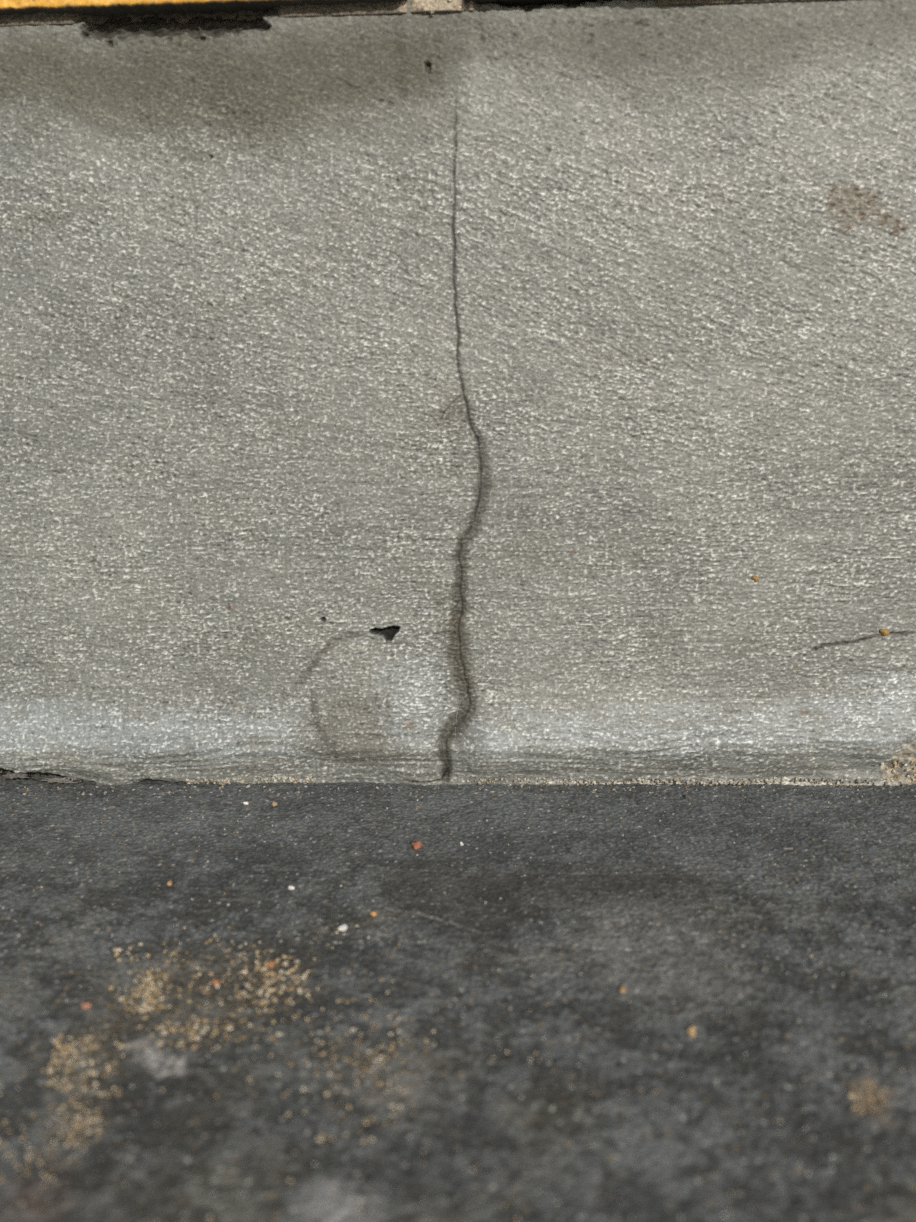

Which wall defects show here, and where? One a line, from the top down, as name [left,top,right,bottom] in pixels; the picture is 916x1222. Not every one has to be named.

peeling [467,0,665,59]
crack [403,115,482,785]